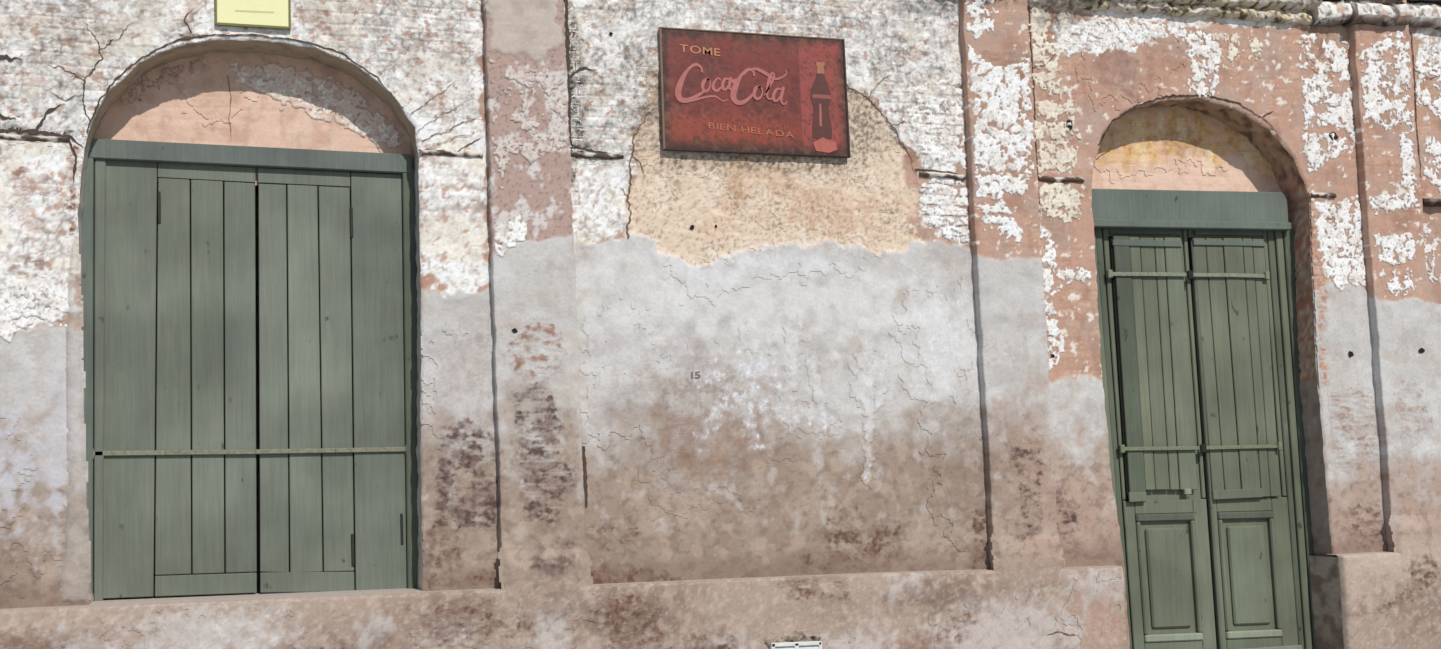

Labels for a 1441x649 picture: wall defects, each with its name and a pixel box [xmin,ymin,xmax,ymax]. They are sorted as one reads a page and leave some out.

flaking render [172,9,211,44]
peeling [229,61,405,149]
peeling [489,59,567,190]
peeling [0,248,69,343]
flaking render [2,143,83,234]
peeling [494,214,528,257]
peeling [906,0,1263,370]
peeling [1298,30,1441,470]